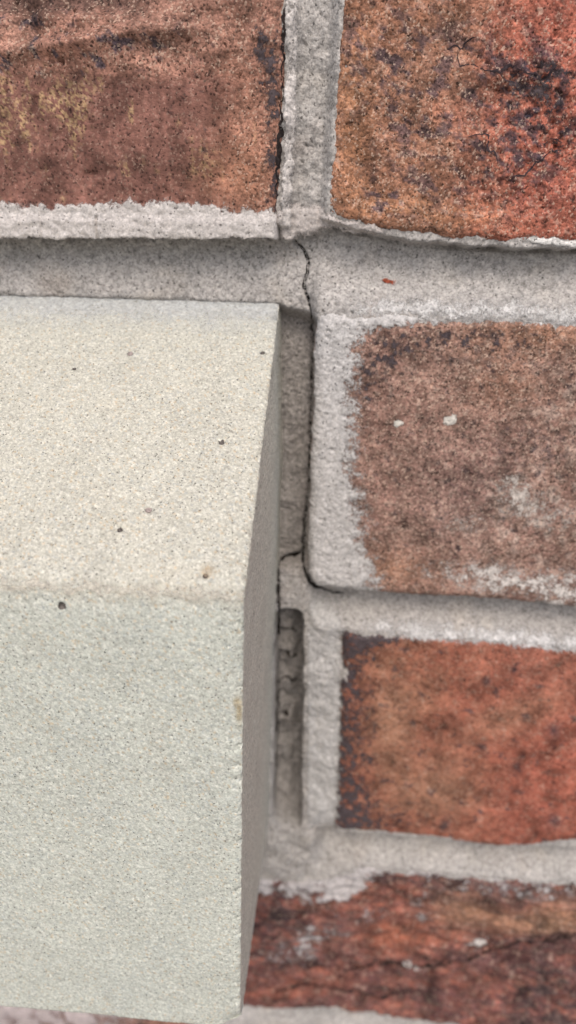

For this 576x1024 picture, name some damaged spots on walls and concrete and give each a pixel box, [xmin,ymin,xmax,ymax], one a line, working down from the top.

crack [275,239,344,768]